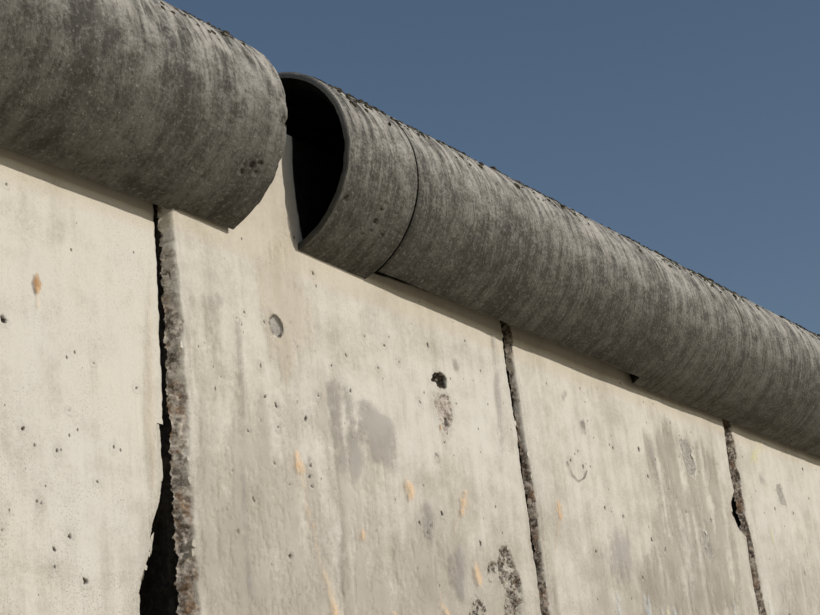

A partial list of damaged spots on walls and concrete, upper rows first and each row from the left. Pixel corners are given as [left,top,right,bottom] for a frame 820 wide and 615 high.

spalling [497,319,555,615]
spalling [469,594,489,615]
spalling [485,542,525,615]